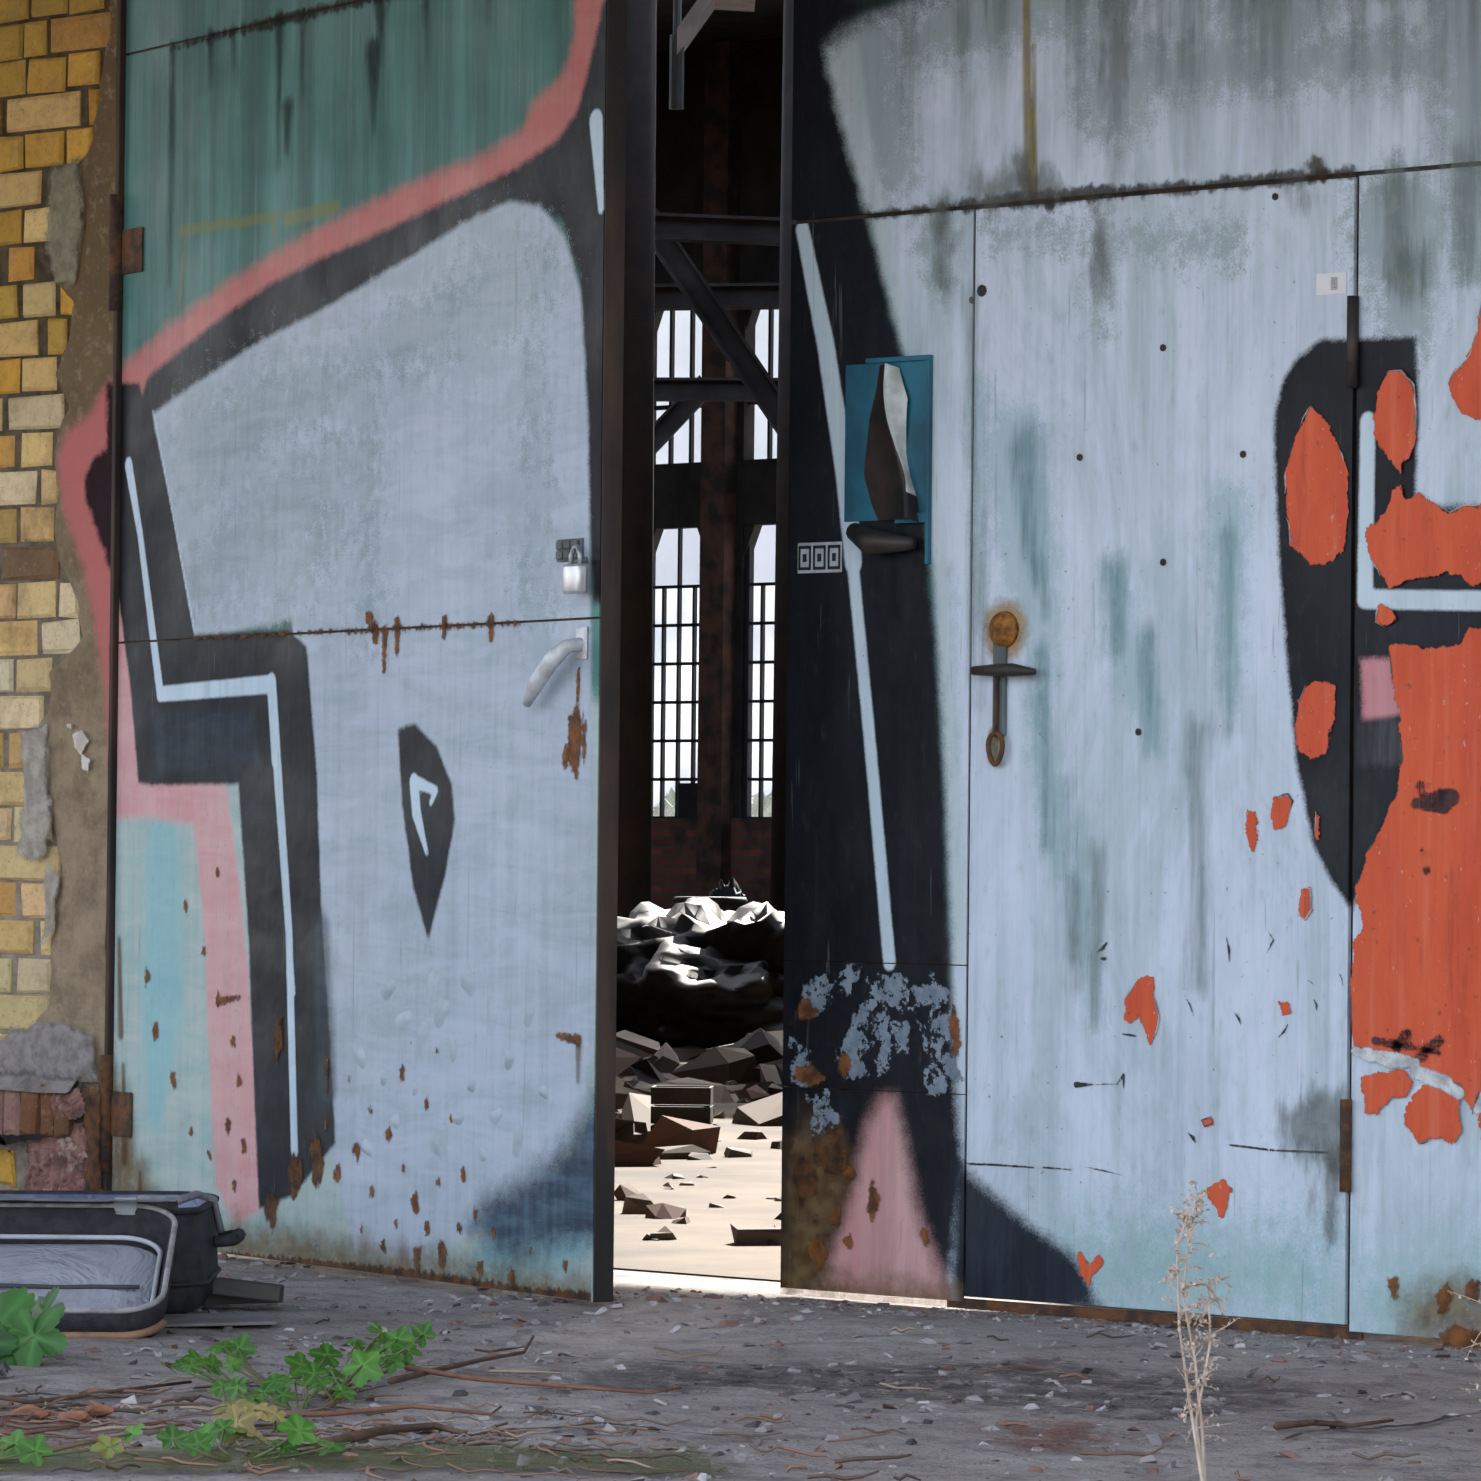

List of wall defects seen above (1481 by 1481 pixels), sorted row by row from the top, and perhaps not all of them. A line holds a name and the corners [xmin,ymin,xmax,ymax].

corrosion [867,0,1354,234]
peeling [1283,406,1349,565]
corrosion [193,612,520,674]
corrosion [562,667,587,779]
peeling [1295,681,1336,760]
peeling [1350,370,1481,1145]
peeling [1245,793,1293,852]
corrosion [556,1032,581,1063]
peeling [788,963,964,1136]
peeling [1124,975,1160,1045]
corrosion [218,1118,591,1301]
corrosion [1415,1279,1481,1349]